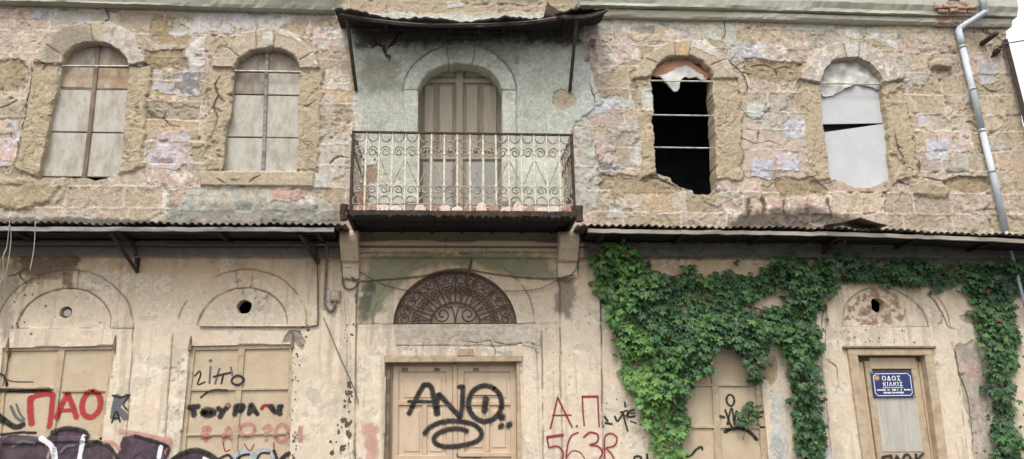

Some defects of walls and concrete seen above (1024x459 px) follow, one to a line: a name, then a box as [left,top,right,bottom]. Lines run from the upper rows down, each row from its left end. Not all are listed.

peeling [0,119,21,167]
crack [212,80,223,136]
peeling [75,11,364,137]
crack [370,32,401,61]
peeling [552,0,977,219]
damp [358,251,553,322]
flaking render [835,288,915,343]
crack [928,294,973,443]
flaking render [954,293,1011,459]